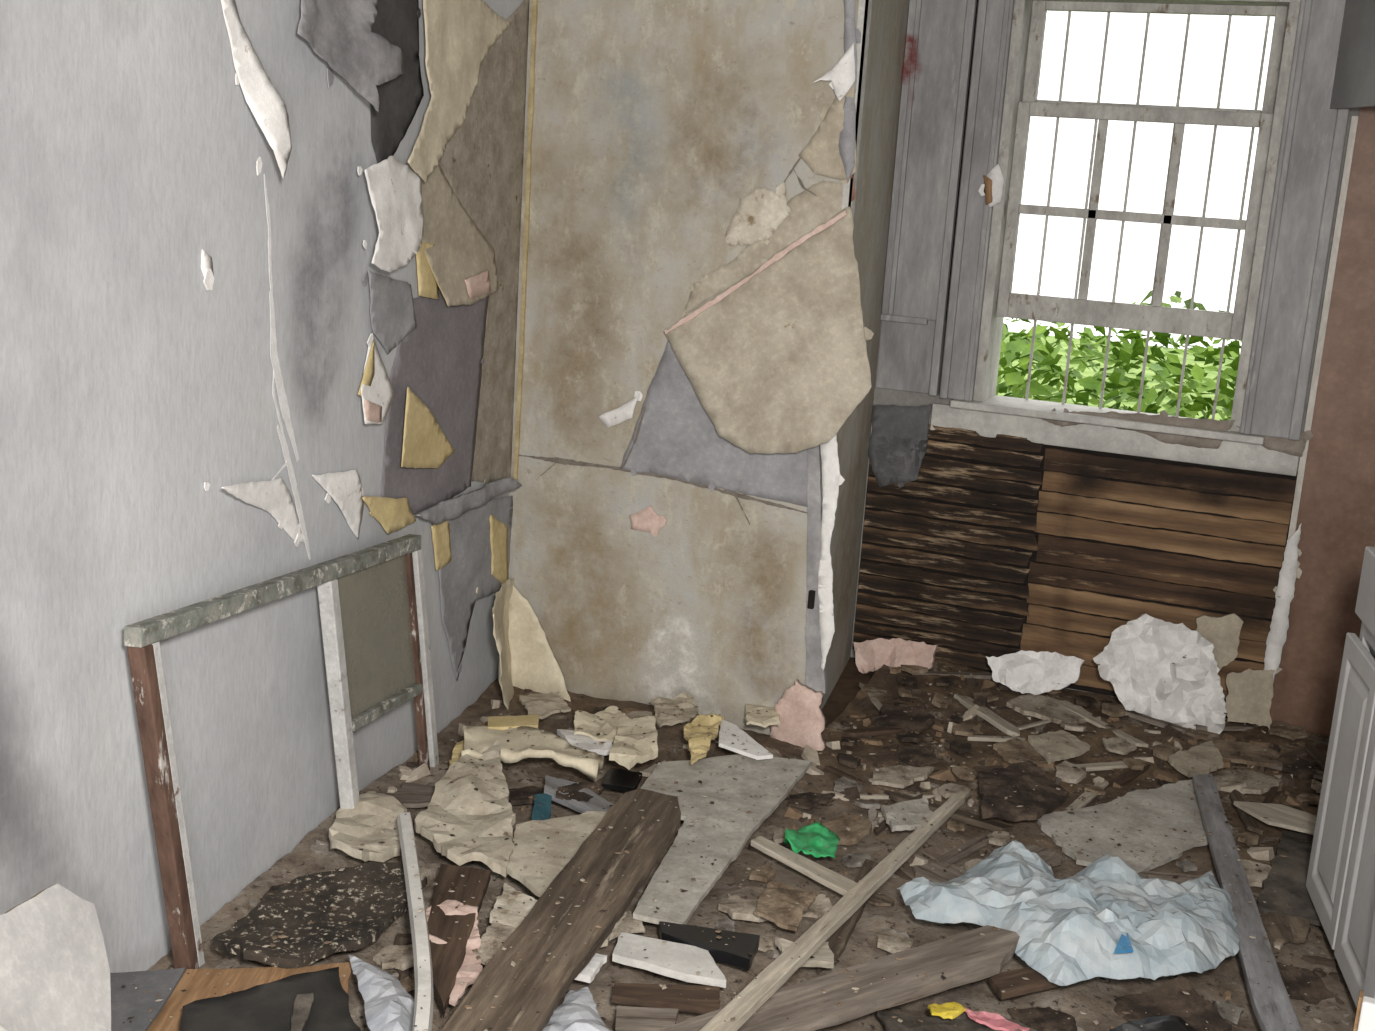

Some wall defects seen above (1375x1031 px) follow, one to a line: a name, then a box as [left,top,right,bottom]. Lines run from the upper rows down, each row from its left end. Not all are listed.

flaking render [382,0,530,515]
flaking render [598,391,643,428]